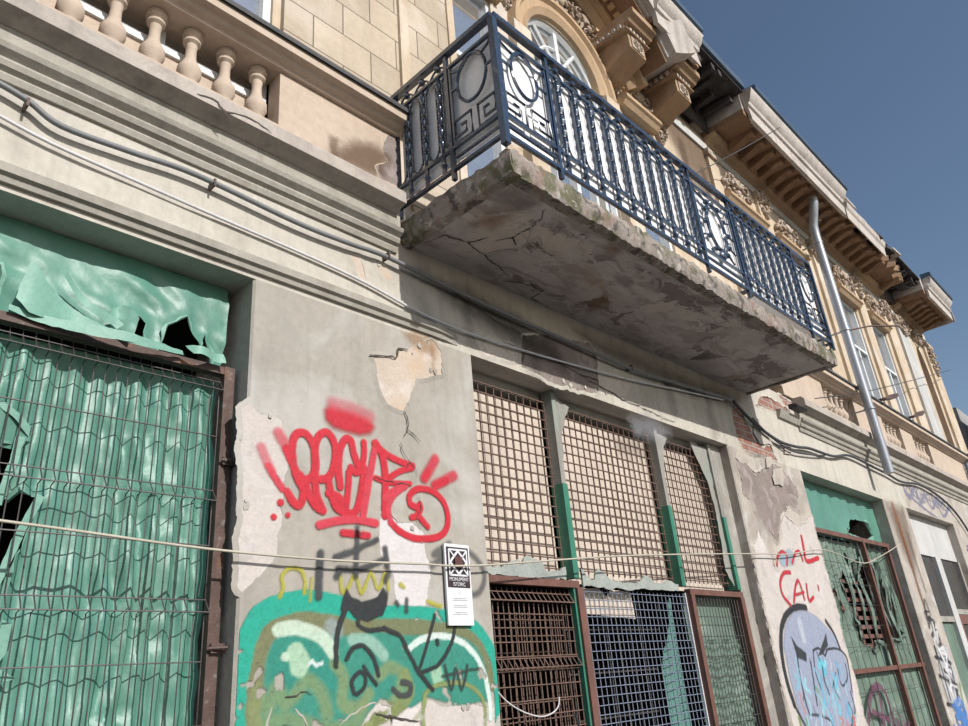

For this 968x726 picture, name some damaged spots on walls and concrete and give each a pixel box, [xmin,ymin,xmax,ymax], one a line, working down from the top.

flaking render [490,2,510,48]
crack [426,210,545,303]
damp [444,288,559,359]
peeling [369,336,445,416]
spalling [400,141,869,726]
peeling [231,396,292,599]
spalling [338,697,499,726]